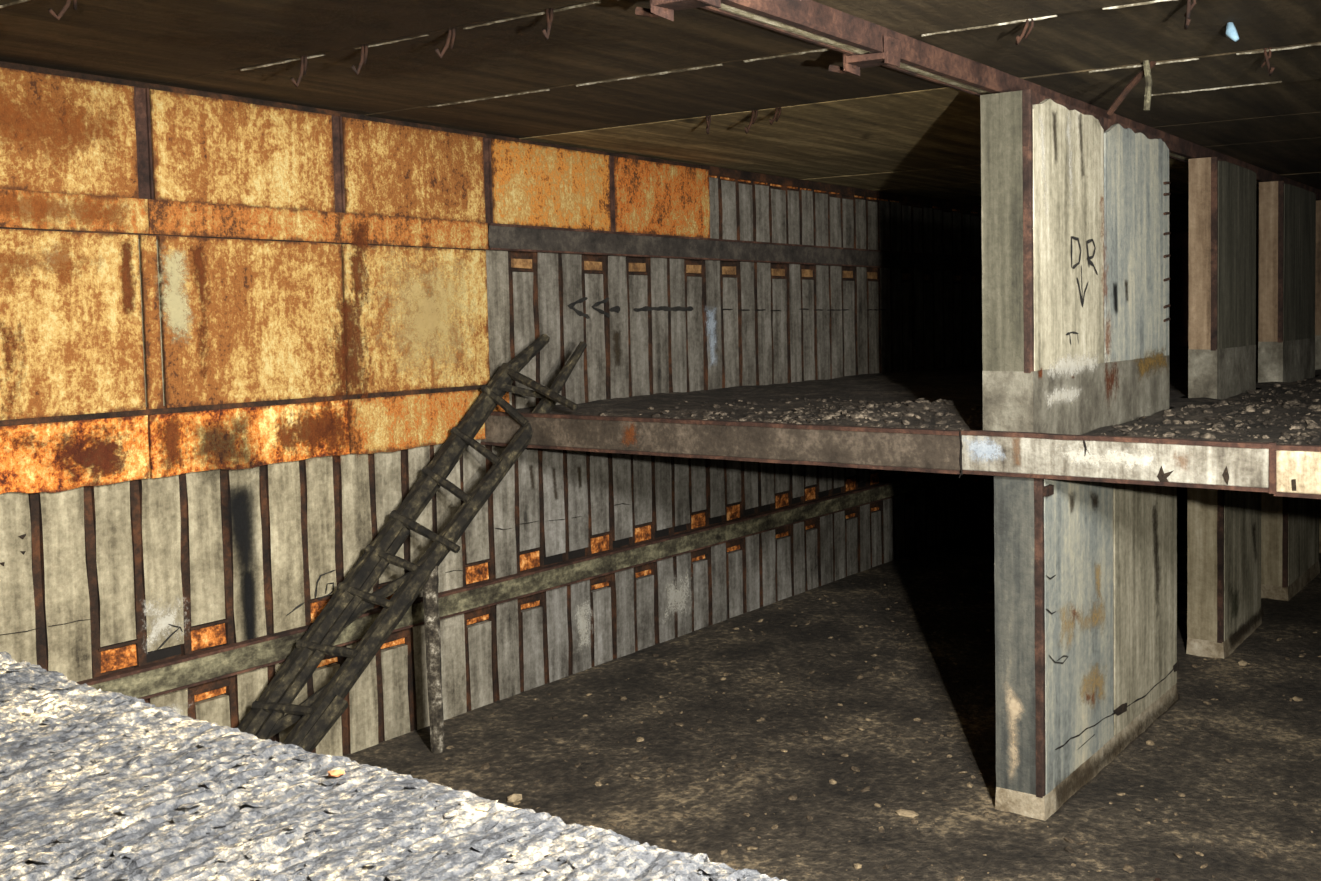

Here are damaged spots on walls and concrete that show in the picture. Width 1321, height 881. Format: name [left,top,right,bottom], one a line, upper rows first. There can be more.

corrosion [0,67,710,494]
damp [226,488,255,640]